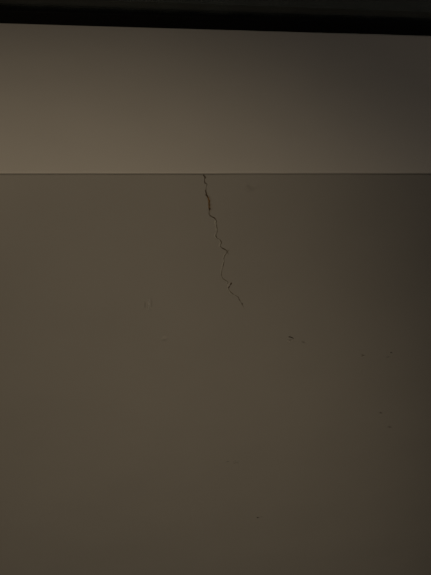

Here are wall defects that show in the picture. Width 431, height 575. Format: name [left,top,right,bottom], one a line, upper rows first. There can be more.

crack [203,174,243,305]